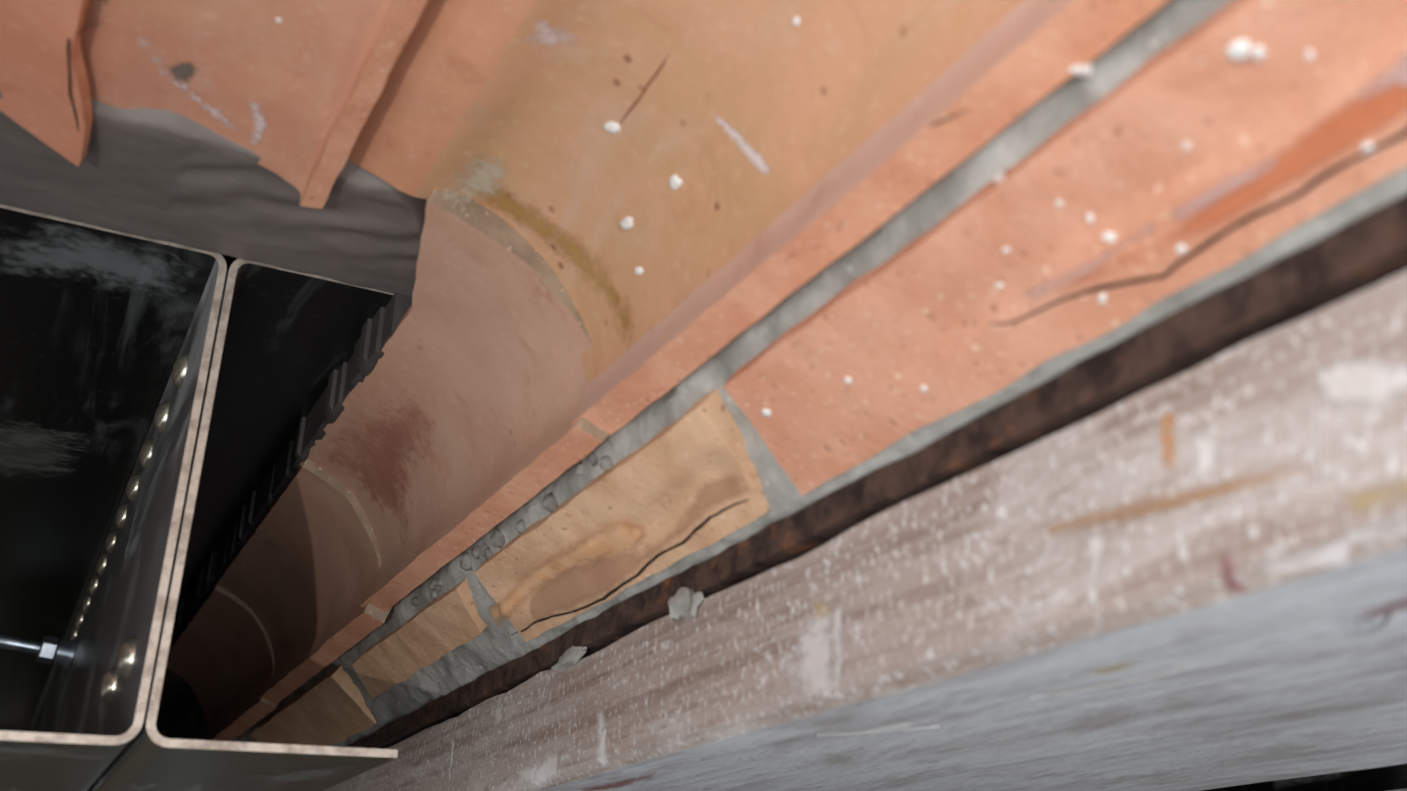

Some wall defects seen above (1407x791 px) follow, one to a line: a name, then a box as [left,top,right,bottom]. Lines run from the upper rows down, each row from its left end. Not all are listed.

crack [67,0,107,131]
crack [988,129,1407,325]
crack [512,492,764,635]